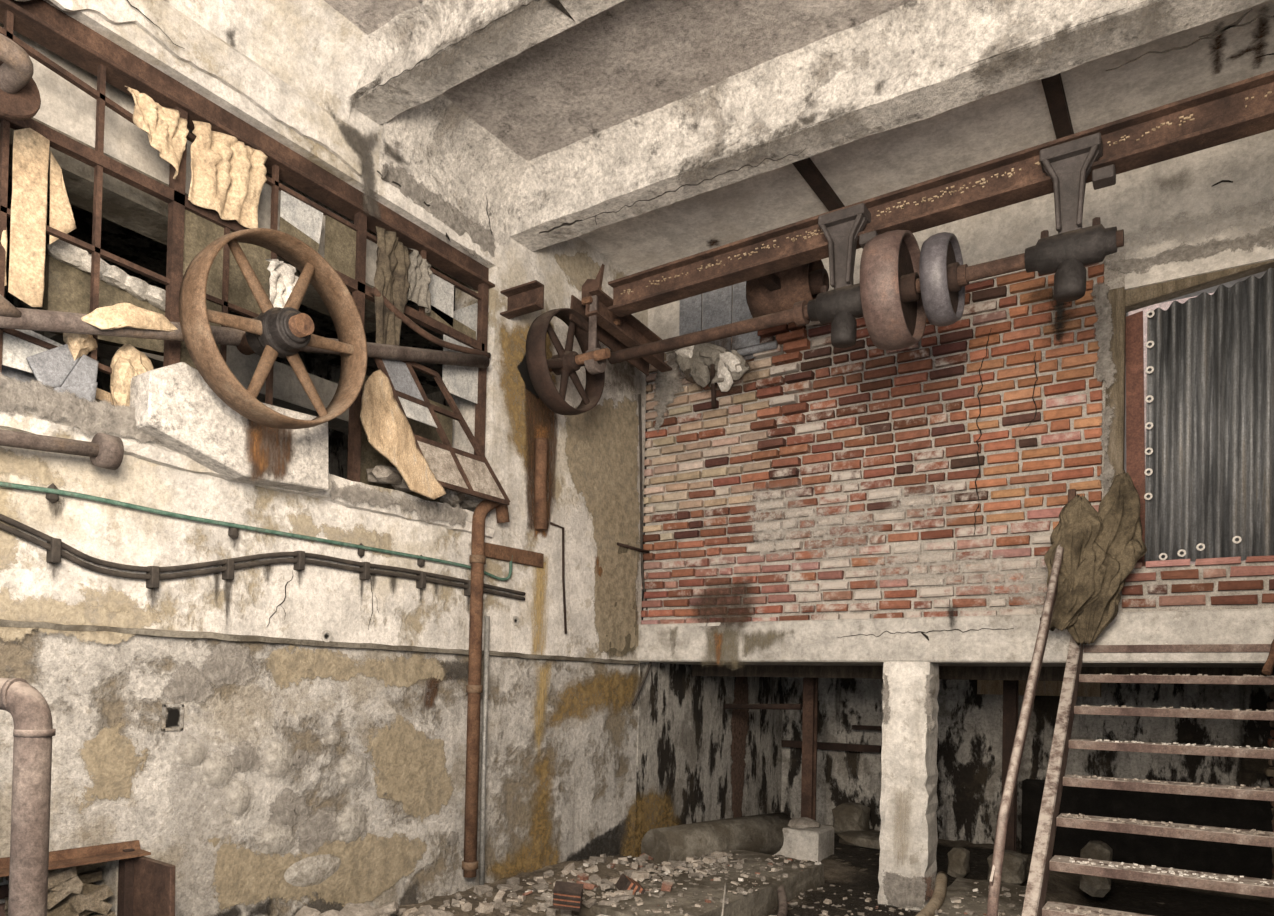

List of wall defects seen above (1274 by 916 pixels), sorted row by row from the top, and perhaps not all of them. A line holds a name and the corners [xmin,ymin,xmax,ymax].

crack [1106,8,1274,71]
rust [1210,8,1269,73]
crack [539,148,806,234]
rust [247,419,292,479]
flaking render [564,351,642,658]
flaking render [163,641,449,704]
damp [550,671,640,726]
flaking render [75,722,148,814]
flaking render [364,715,455,822]
flaking render [207,788,427,911]
damp [492,757,559,879]
damp [622,792,678,857]